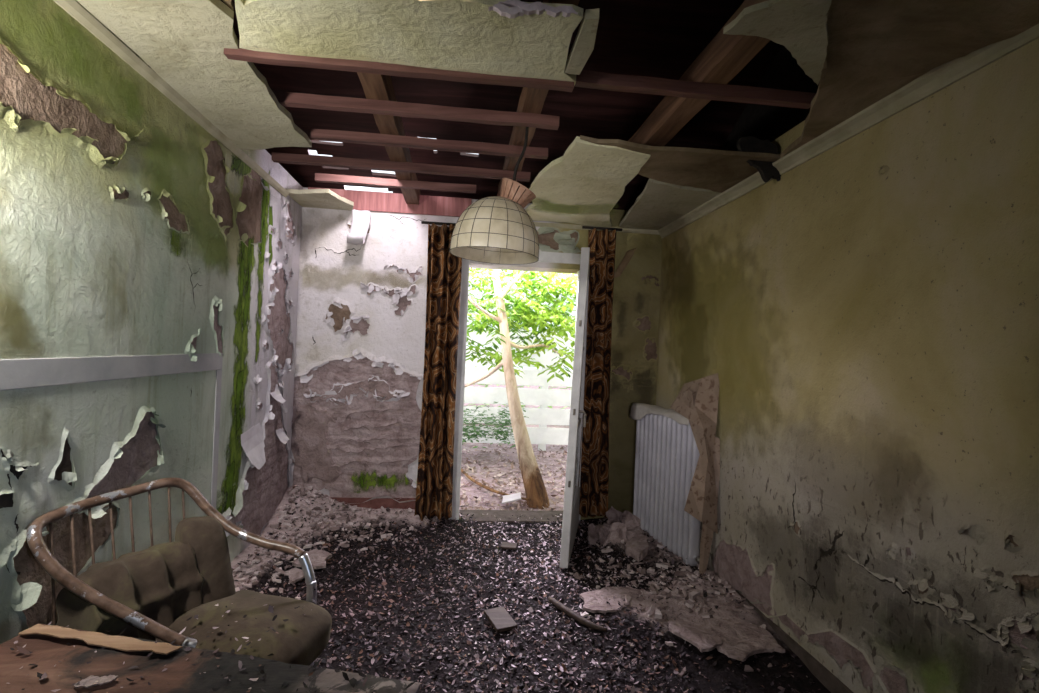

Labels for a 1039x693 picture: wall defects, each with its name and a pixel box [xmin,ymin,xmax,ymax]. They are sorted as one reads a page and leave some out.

peeling [0,38,150,171]
spalling [201,137,424,542]
crack [0,516,21,575]
crack [0,446,39,490]
peeling [7,529,64,631]
peeling [42,406,166,576]
crack [788,483,800,530]
crack [798,548,1030,658]
peeling [907,579,975,624]